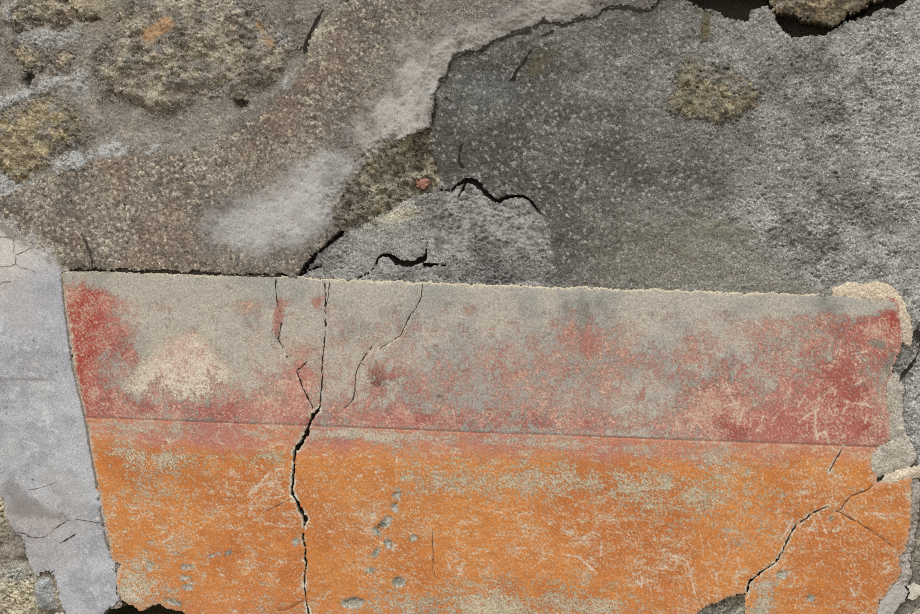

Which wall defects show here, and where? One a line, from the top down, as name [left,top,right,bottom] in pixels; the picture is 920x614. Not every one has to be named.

crack [438,1,660,99]
spalling [332,119,547,259]
crack [442,143,546,217]
crack [344,248,446,409]
crack [17,231,344,614]
crack [827,444,846,474]
crack [745,486,892,598]
peeling [338,571,665,614]
peeling [876,582,920,614]